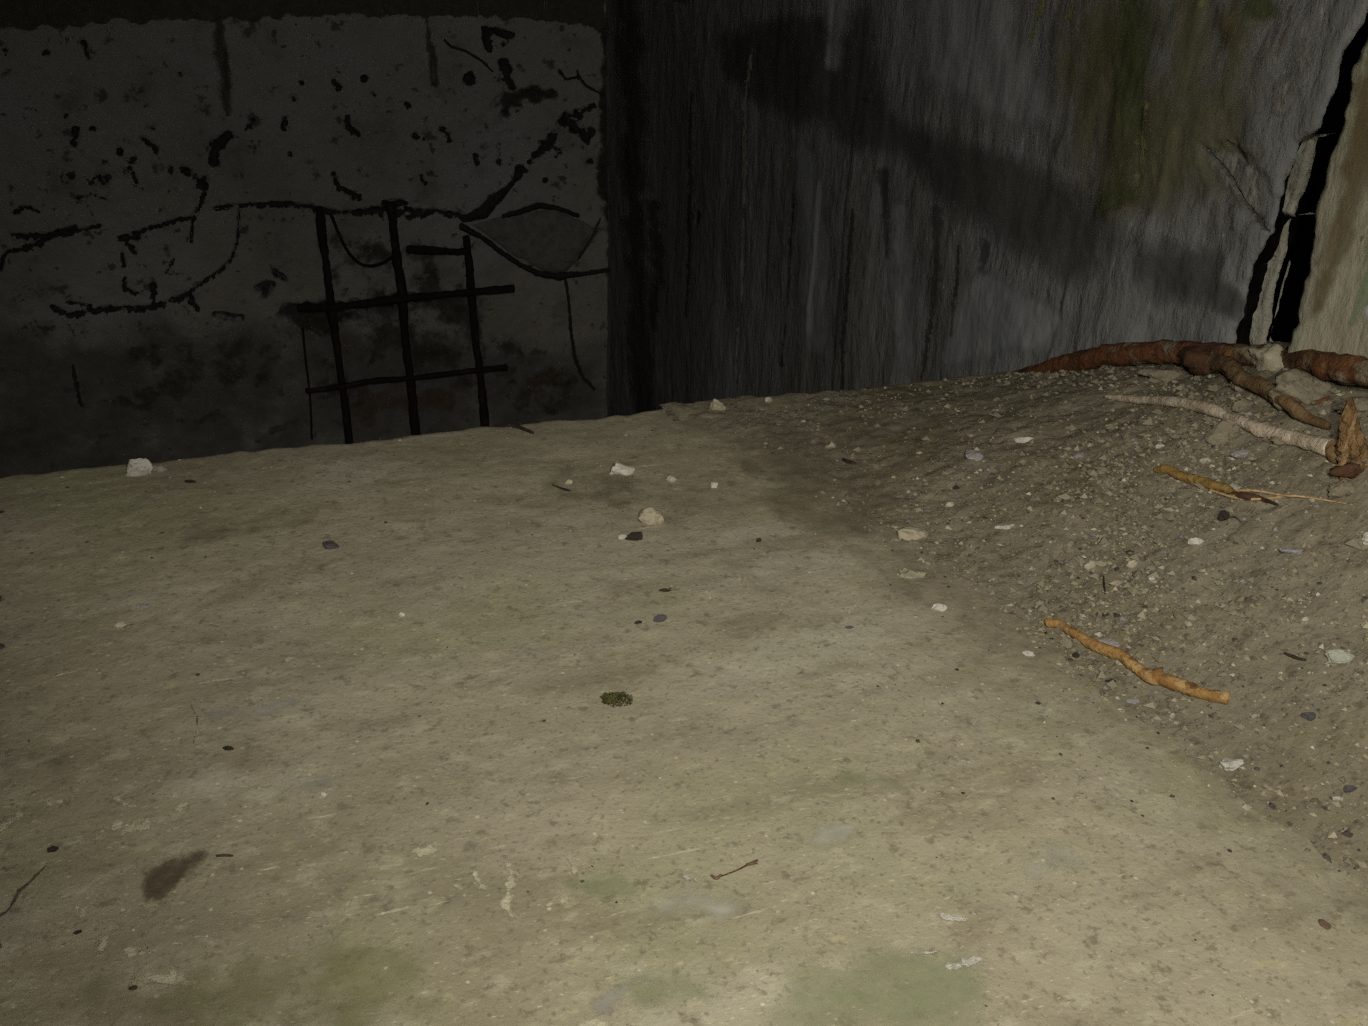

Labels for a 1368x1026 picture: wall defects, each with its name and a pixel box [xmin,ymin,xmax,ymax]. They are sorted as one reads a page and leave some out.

crack [443,39,494,72]
crack [558,69,600,94]
crack [0,167,463,319]
crack [1236,136,1331,345]
spalling [280,201,515,444]
water stain [144,851,203,899]